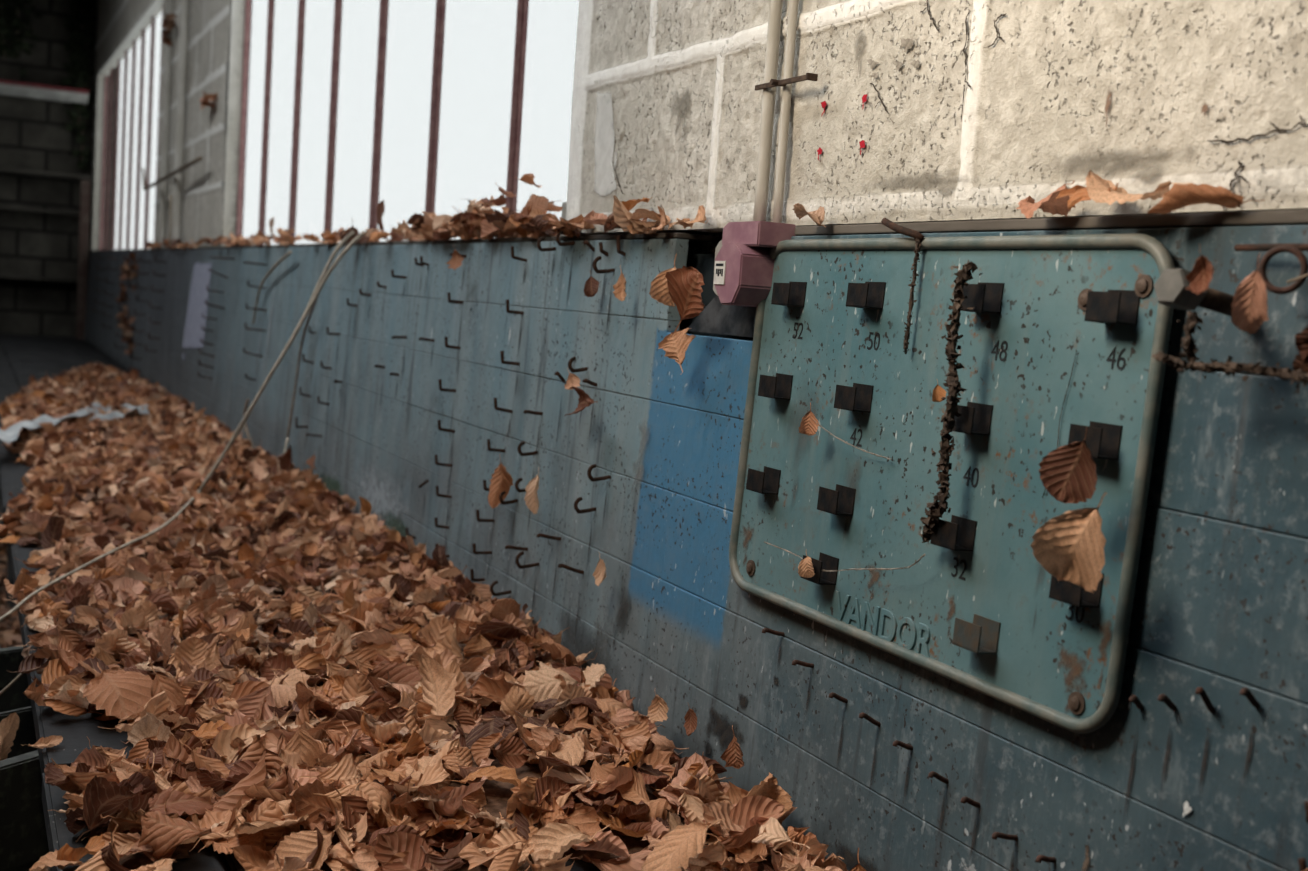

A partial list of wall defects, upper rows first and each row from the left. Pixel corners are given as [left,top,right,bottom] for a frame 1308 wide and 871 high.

crack [1207,115,1308,211]
corrosion [1058,650,1084,709]